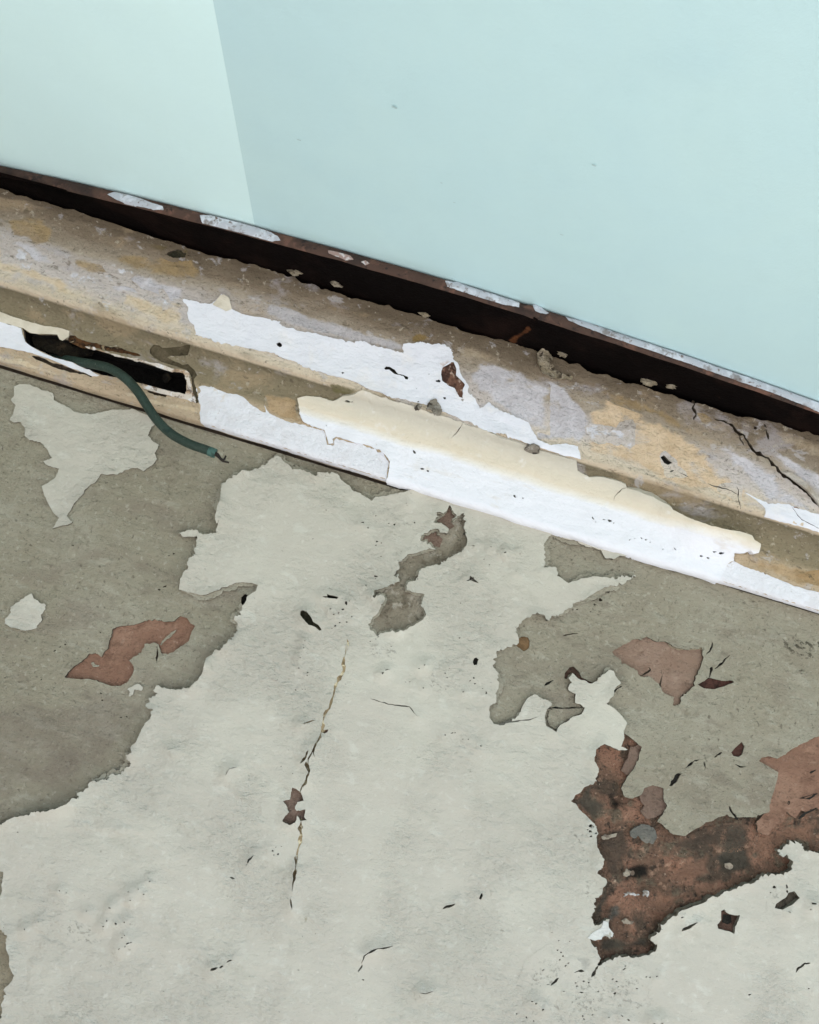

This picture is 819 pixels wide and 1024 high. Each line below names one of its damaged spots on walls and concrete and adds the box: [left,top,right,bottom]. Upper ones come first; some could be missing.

peeling [0,312,69,341]
flaking render [34,357,92,377]
flaking render [150,345,199,403]
corrosion [438,356,469,400]
crack [691,400,819,525]
peeling [0,368,819,964]
crack [299,640,349,793]
crack [290,818,303,906]
peeling [0,930,14,1017]